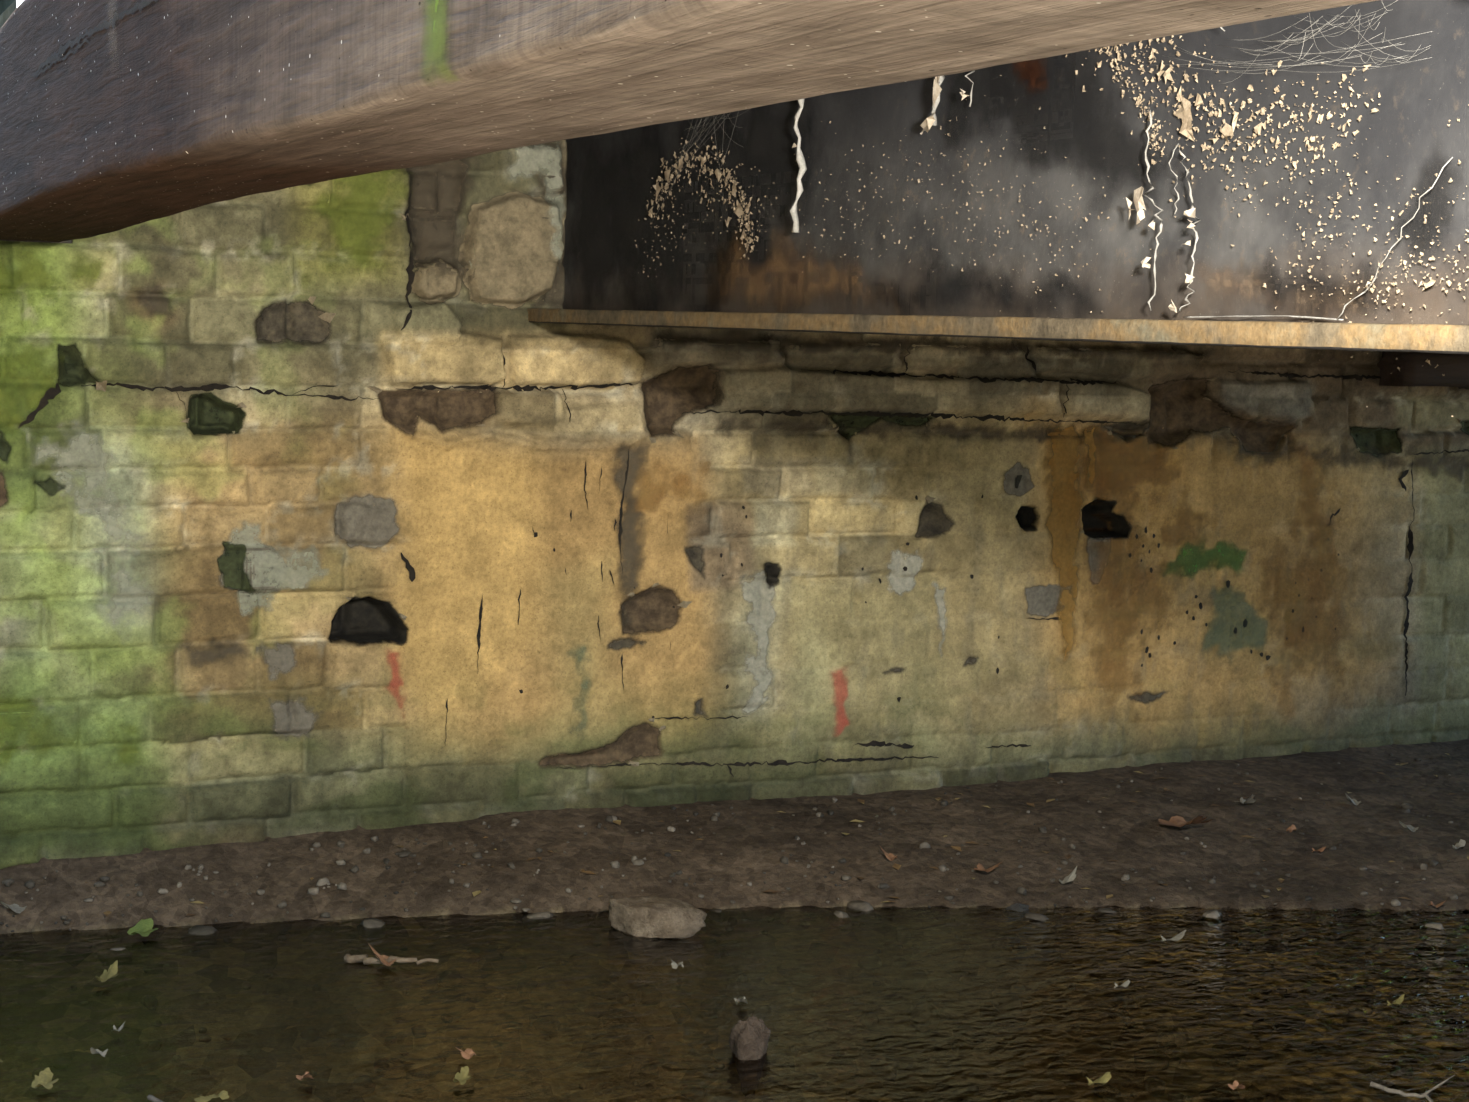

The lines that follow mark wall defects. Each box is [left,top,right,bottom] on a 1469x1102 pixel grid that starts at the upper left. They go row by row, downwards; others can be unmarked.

peeling [635,136,777,277]
peeling [791,131,1109,295]
peeling [1065,35,1469,323]
spalling [255,296,336,344]
crack [18,336,638,429]
spalling [367,385,498,436]
crack [1228,370,1381,381]
water stain [614,446,648,624]
spalling [608,582,692,650]
corrosion [1044,425,1097,659]
crack [1398,449,1469,696]
spalling [538,716,666,767]